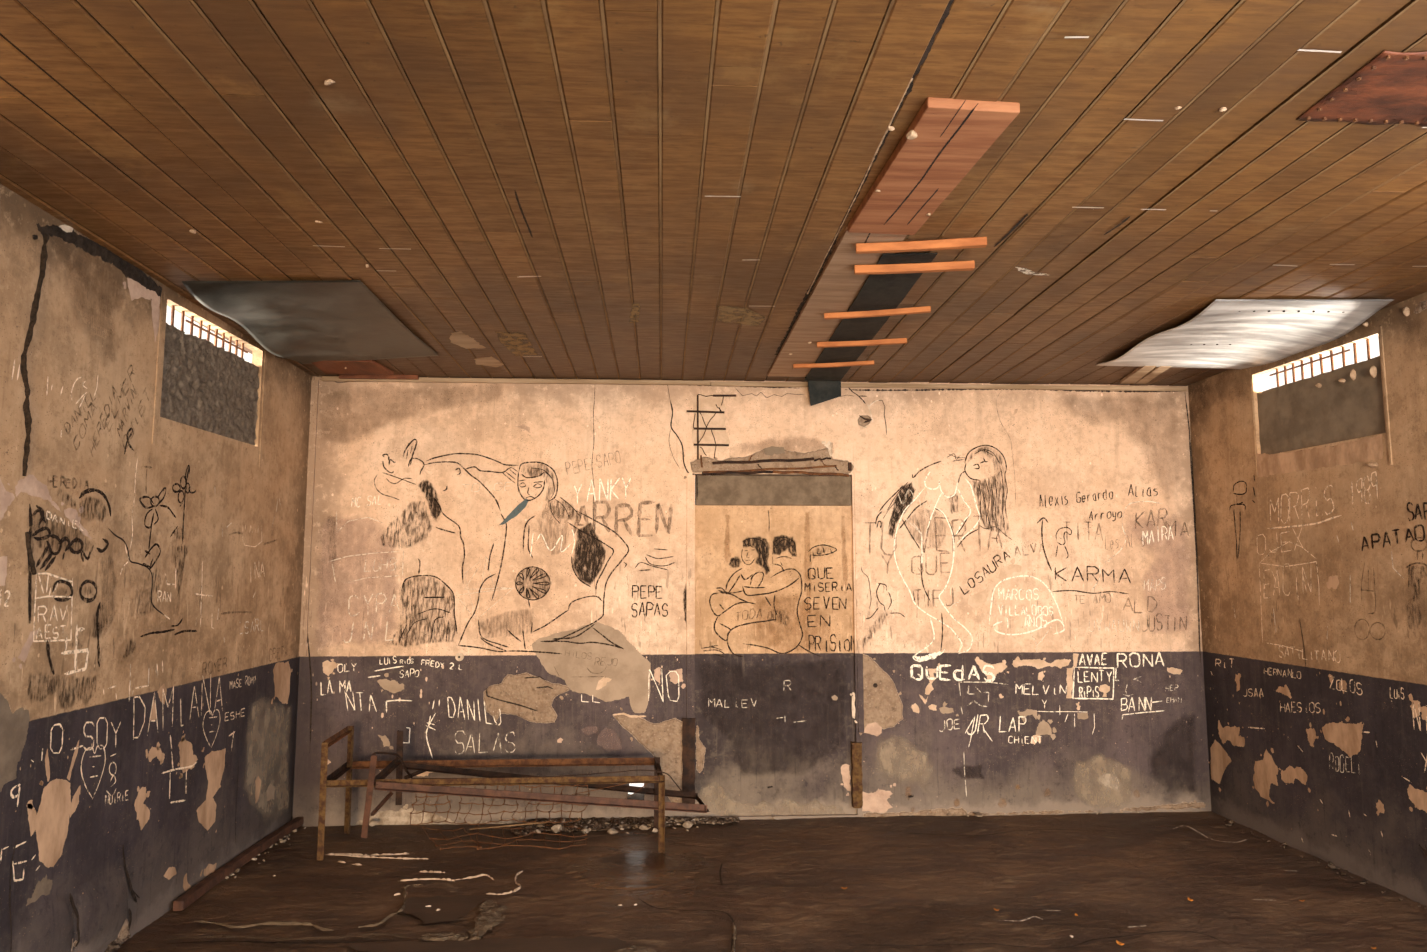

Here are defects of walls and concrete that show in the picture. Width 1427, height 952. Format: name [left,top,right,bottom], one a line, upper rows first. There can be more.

flaking render [680,394,854,479]
peeling [271,661,292,704]
flaking render [483,673,574,743]
flaking render [832,654,959,736]
peeling [975,653,1088,720]
peeling [1018,709,1057,745]
peeling [1306,717,1363,757]
peeling [26,741,81,906]
peeling [134,786,151,830]
peeling [146,730,226,832]
flaking render [841,764,1097,817]
peeling [1407,784,1427,813]